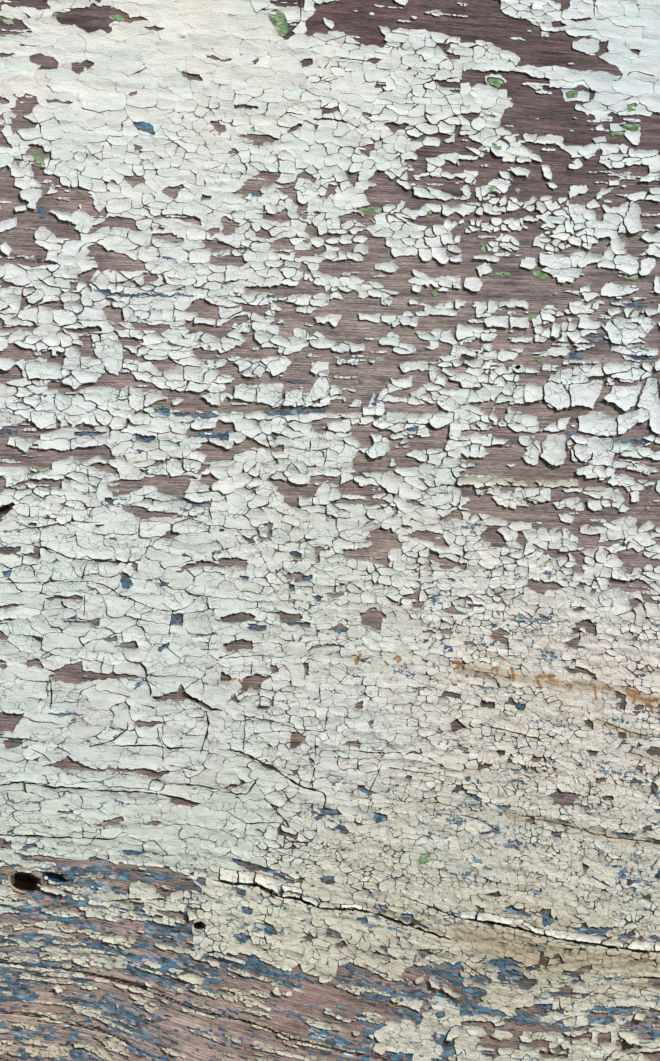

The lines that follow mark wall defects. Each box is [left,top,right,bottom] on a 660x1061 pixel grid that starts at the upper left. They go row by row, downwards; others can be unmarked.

crack [499,0,660,213]
crack [413,163,552,257]
peeling [0,0,660,649]
crack [498,285,660,385]
crack [371,412,443,462]
crack [408,327,659,512]
crack [0,1000,133,1061]
crack [0,909,168,1020]
crack [136,961,364,1061]
crack [324,984,470,1061]
peeling [392,952,660,1061]
crack [509,1023,660,1061]